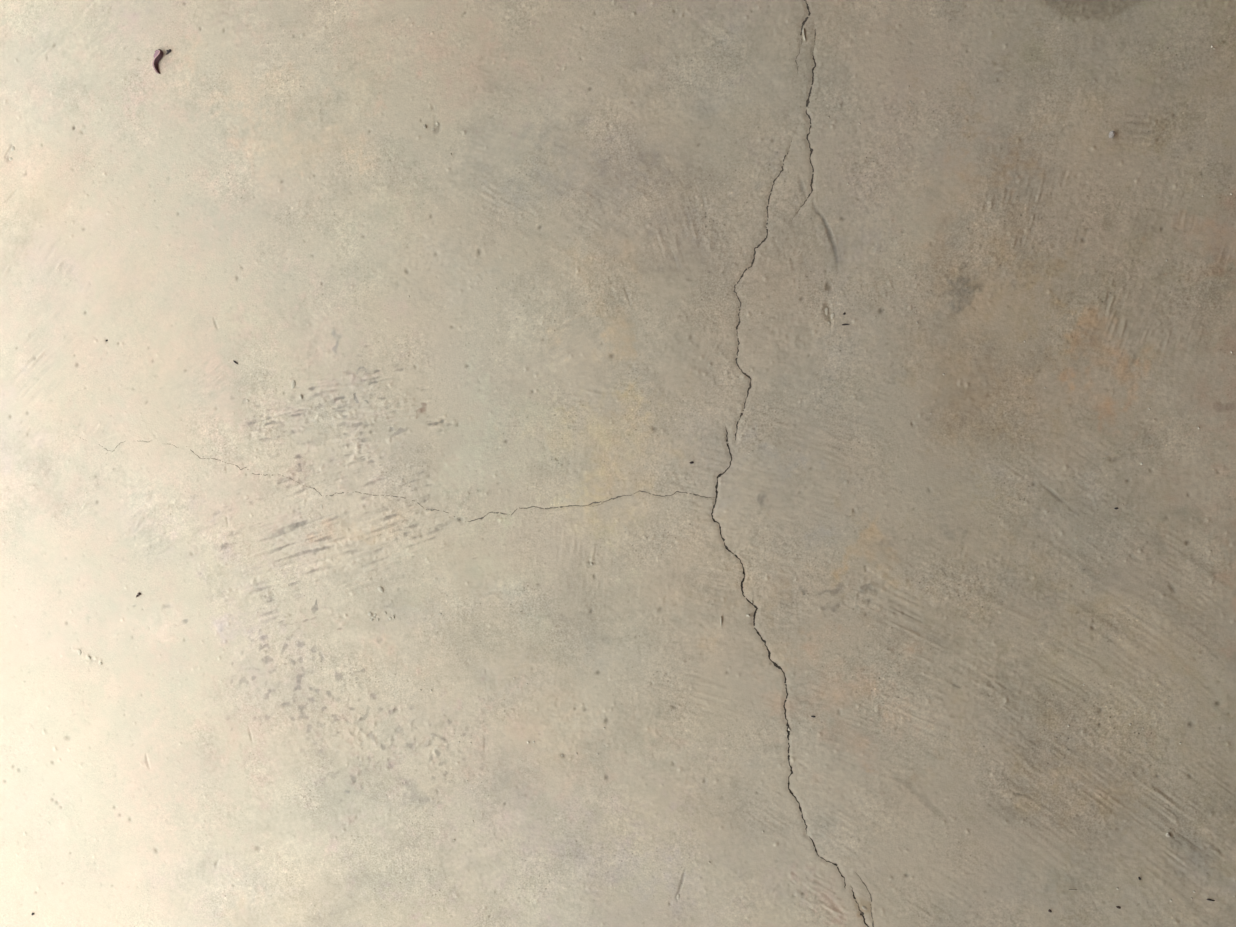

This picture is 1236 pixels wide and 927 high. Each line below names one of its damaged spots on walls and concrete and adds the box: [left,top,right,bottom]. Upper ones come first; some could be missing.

crack [83,0,874,927]
leakage [1028,0,1152,24]